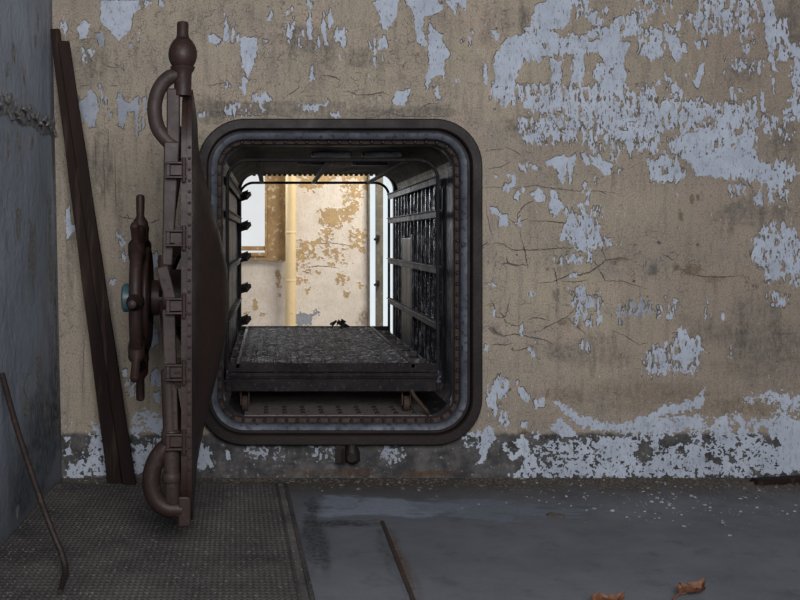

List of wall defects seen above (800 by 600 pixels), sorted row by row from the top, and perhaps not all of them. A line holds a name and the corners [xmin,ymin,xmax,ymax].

peeling [59,0,164,63]
peeling [77,82,147,136]
peeling [208,12,273,118]
peeling [284,0,348,50]
peeling [367,0,468,101]
peeling [482,0,800,327]
peeling [296,175,368,298]
crack [482,147,647,360]
peeling [641,326,705,380]
peeling [63,422,106,478]
peeling [197,442,214,470]
peeling [461,373,800,478]